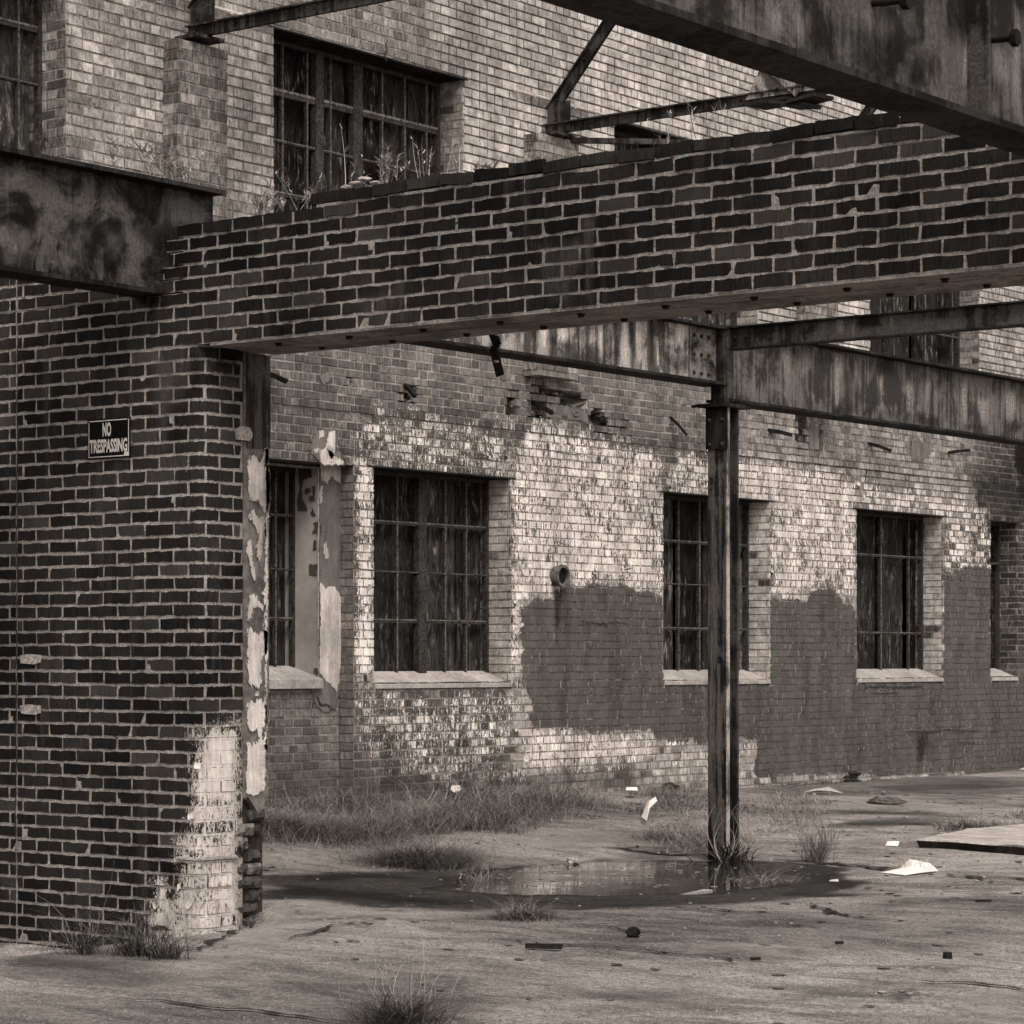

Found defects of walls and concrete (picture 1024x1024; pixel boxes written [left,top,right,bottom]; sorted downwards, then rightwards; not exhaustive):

peeling [145,448,271,939]
peeling [297,387,708,790]
peeling [739,416,991,608]